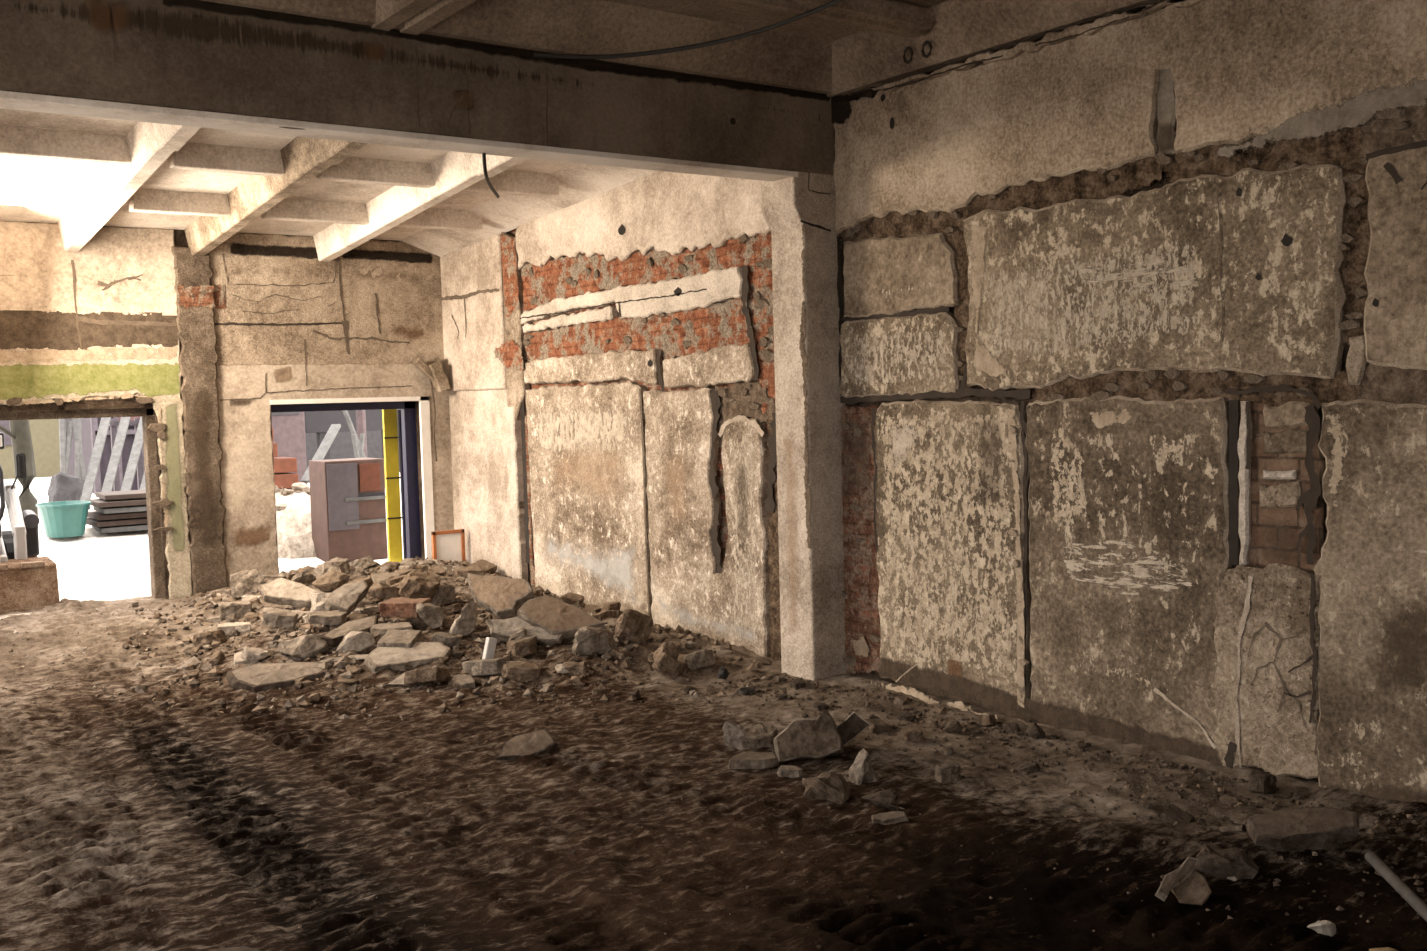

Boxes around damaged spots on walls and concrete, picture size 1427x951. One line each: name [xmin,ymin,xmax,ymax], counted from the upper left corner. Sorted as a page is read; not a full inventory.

peeling [0,284,225,551]
flaking render [494,233,776,642]
spalling [837,78,1427,708]
crack [1216,195,1224,348]
crack [1153,384,1321,769]